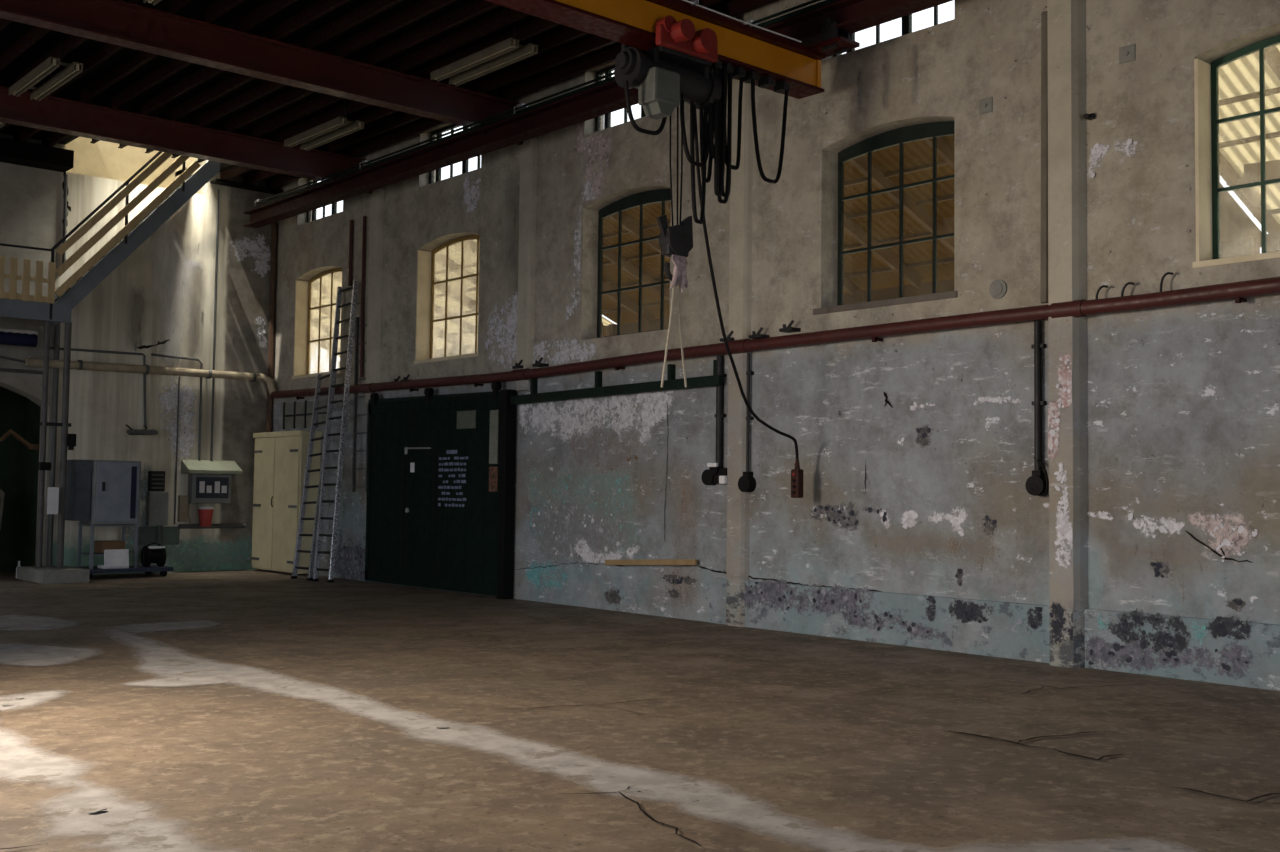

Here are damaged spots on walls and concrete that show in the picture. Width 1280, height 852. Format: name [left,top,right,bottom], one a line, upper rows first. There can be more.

peeling [519,390,675,446]
peeling [1048,352,1073,568]
peeling [810,502,997,537]
peeling [1087,510,1260,564]